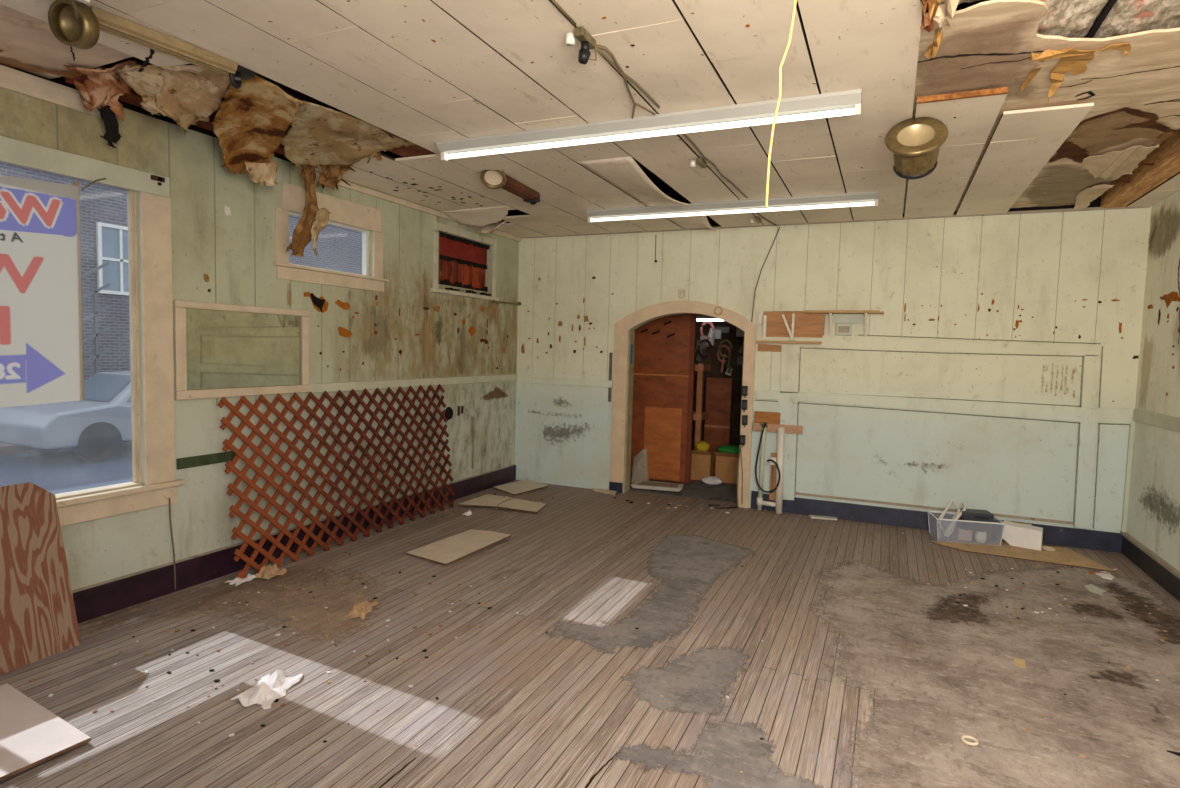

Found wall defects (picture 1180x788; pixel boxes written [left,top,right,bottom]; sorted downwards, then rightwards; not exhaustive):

water stain [1148,209,1179,257]
water stain [1140,487,1180,530]